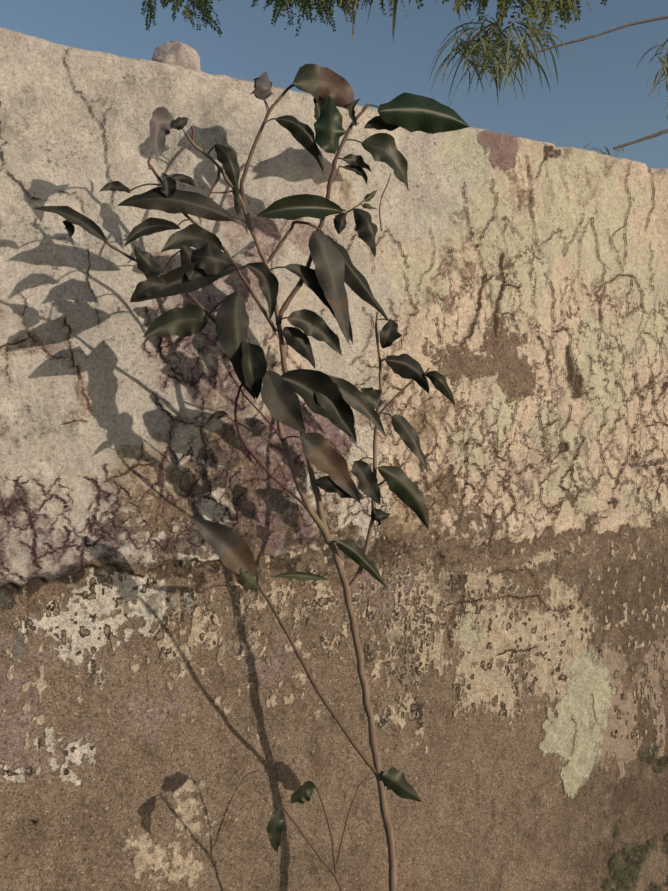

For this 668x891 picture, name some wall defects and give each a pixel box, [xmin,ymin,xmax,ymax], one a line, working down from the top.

crack [64,48,116,211]
crack [0,101,100,324]
crack [0,154,668,585]
peeling [0,420,668,804]
crack [496,647,535,656]
crack [447,568,590,648]
peeling [121,774,218,891]